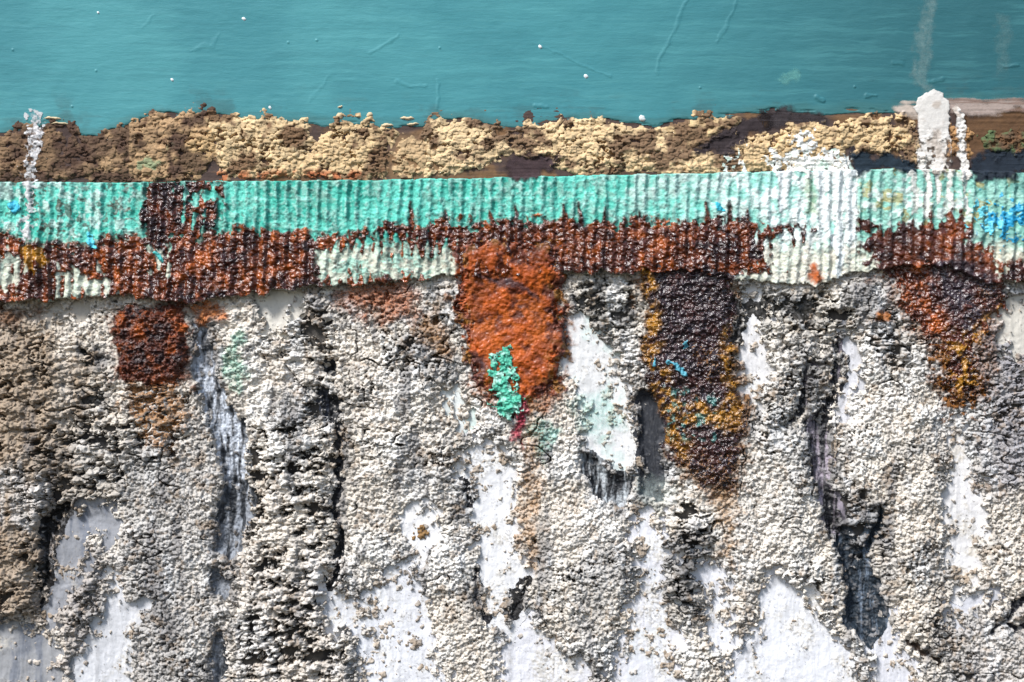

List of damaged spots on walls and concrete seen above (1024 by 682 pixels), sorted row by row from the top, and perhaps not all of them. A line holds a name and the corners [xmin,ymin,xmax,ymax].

rust [0,181,817,533]
flaking render [558,307,644,474]
rust [808,263,822,283]
rust [855,208,1024,424]
flaking render [0,490,157,682]
flaking render [316,359,922,682]
flaking render [933,411,1006,630]